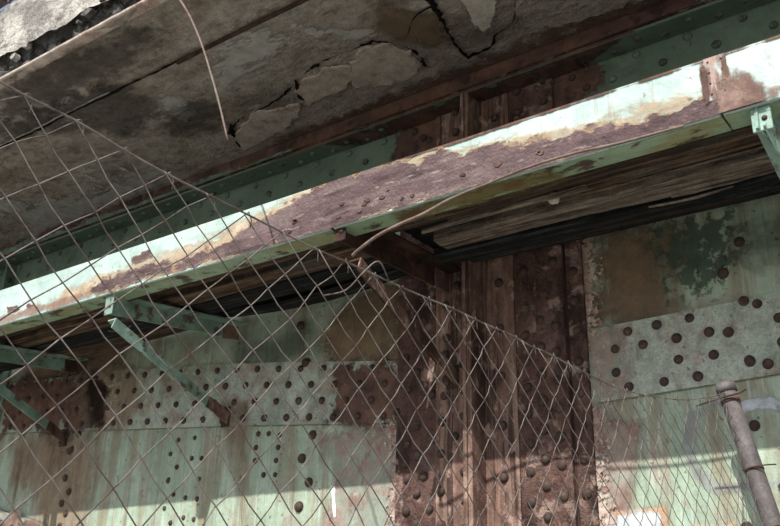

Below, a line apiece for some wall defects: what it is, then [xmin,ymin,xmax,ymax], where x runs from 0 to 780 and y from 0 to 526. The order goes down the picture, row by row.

spalling [0,0,141,77]
spalling [235,41,422,151]
crack [227,0,516,147]
corrosion [270,0,667,148]
water stain [0,166,180,237]
corrosion [0,30,780,323]
corrosion [0,367,138,526]